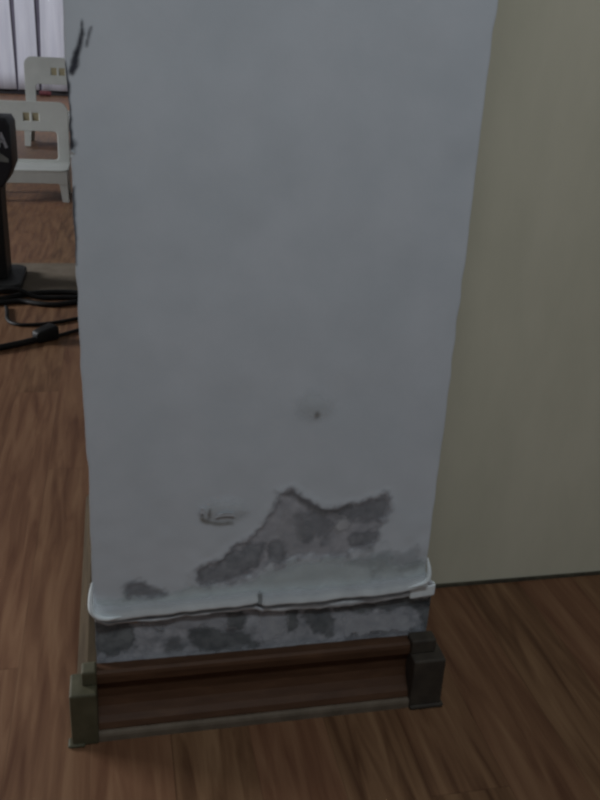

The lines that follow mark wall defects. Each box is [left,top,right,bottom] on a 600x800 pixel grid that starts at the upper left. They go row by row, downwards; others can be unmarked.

spalling [88,557,435,664]